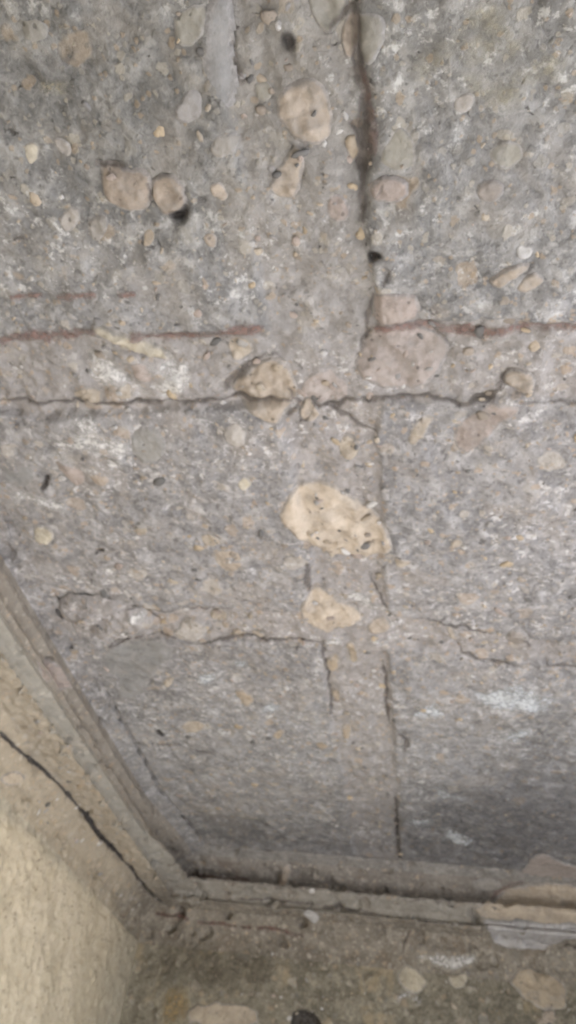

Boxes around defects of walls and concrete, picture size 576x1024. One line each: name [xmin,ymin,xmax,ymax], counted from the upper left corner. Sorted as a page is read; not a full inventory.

crack [333,3,373,210]
corrosion [0,329,95,343]
corrosion [129,325,263,344]
crack [361,279,387,349]
corrosion [374,320,576,337]
crack [13,370,503,430]
crack [304,564,312,590]
crack [202,610,333,714]
crack [436,621,530,667]
crack [382,665,410,750]
crack [0,731,163,902]
crack [393,798,401,857]